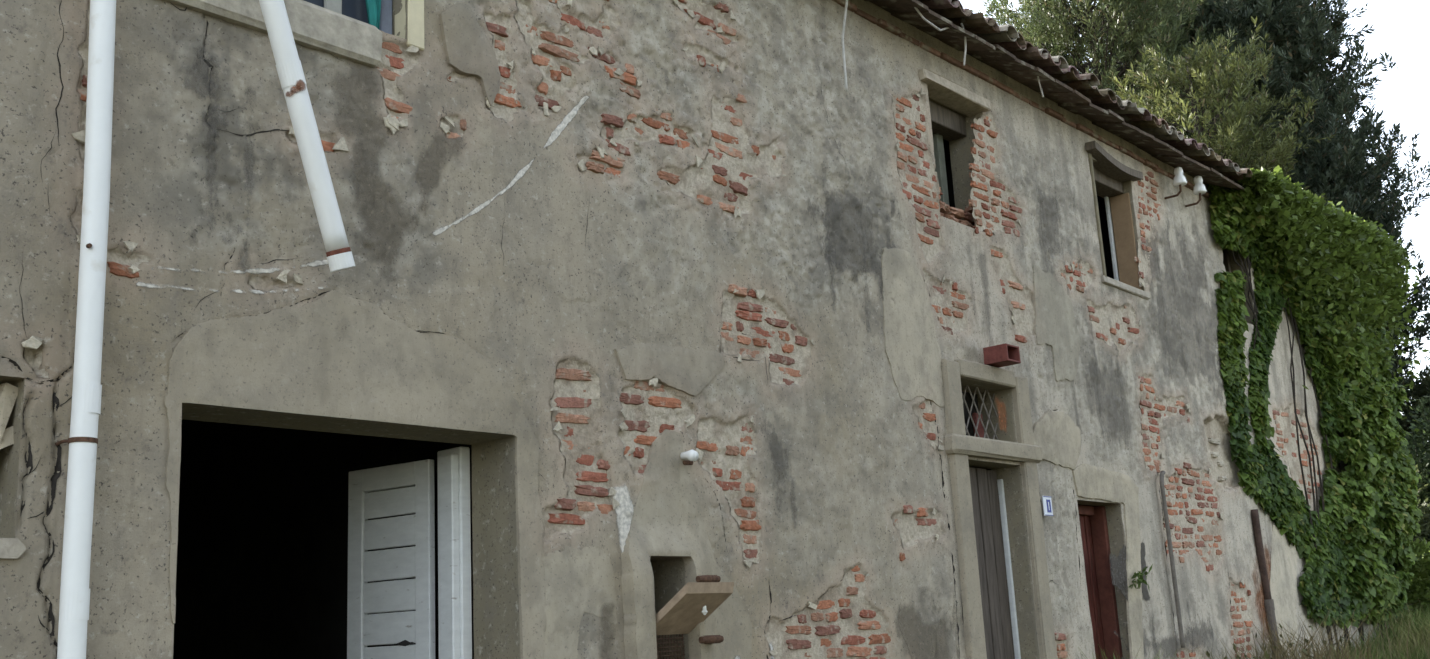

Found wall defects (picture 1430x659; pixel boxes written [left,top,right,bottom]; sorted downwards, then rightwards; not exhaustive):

spalling [21,335,48,378]
crack [2,247,72,647]
crack [41,0,64,212]
spalling [484,0,787,218]
spalling [542,358,761,568]
spalling [720,284,814,387]
spalling [766,565,892,659]
water stain [811,185,894,300]
spalling [892,88,972,335]
spalling [968,111,1035,343]
peeling [1109,542,1150,601]
spalling [1138,374,1254,659]